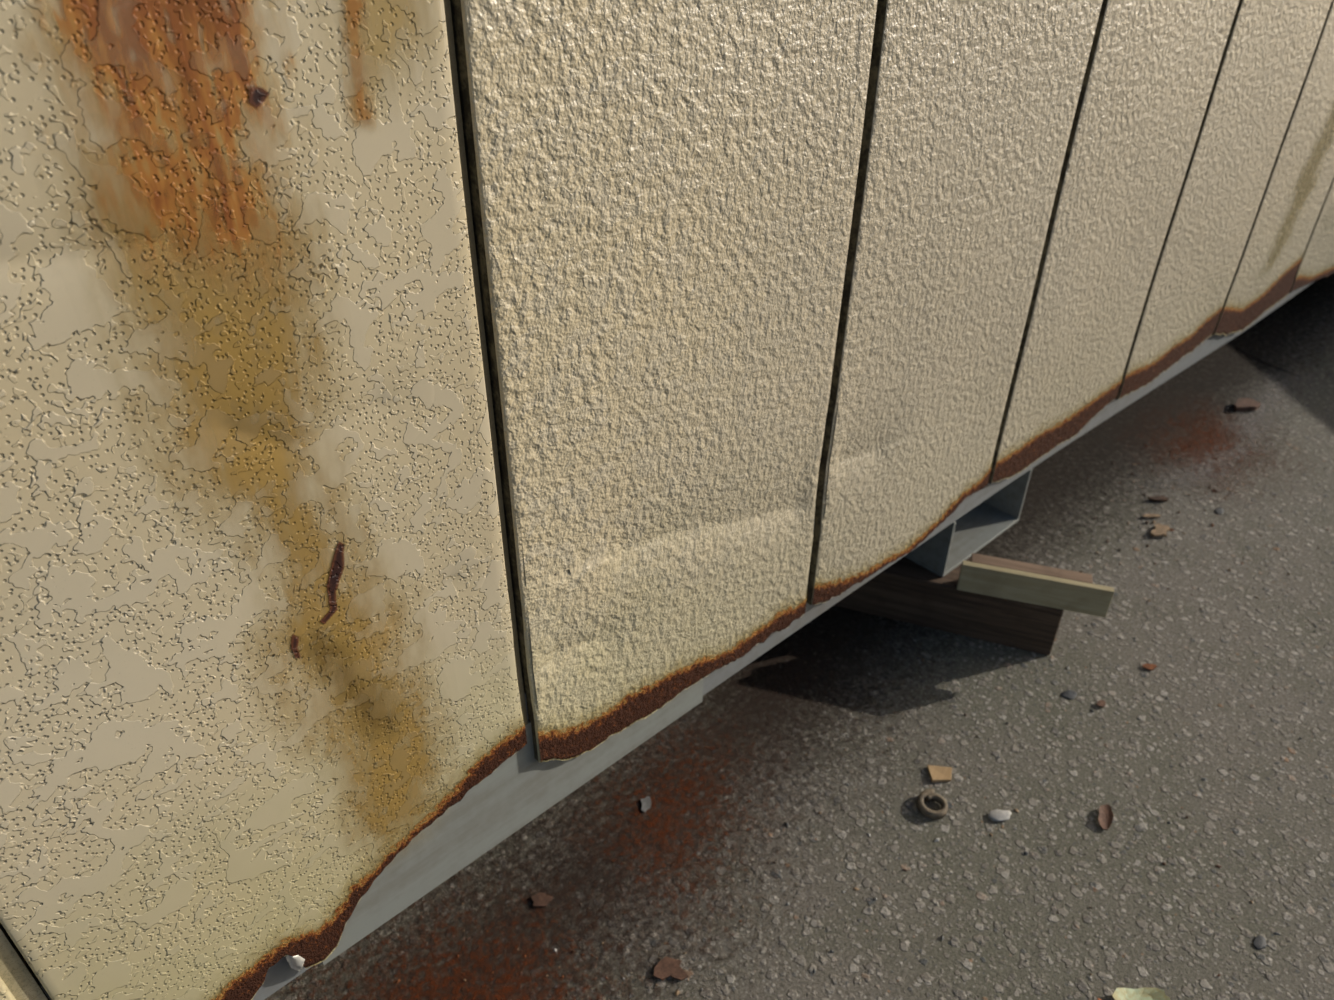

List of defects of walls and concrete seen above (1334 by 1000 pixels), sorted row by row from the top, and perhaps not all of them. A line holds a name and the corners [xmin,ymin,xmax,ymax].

rust [42,0,527,1000]
rust [538,257,1334,762]
rust [531,892,553,907]
rust [654,957,689,981]